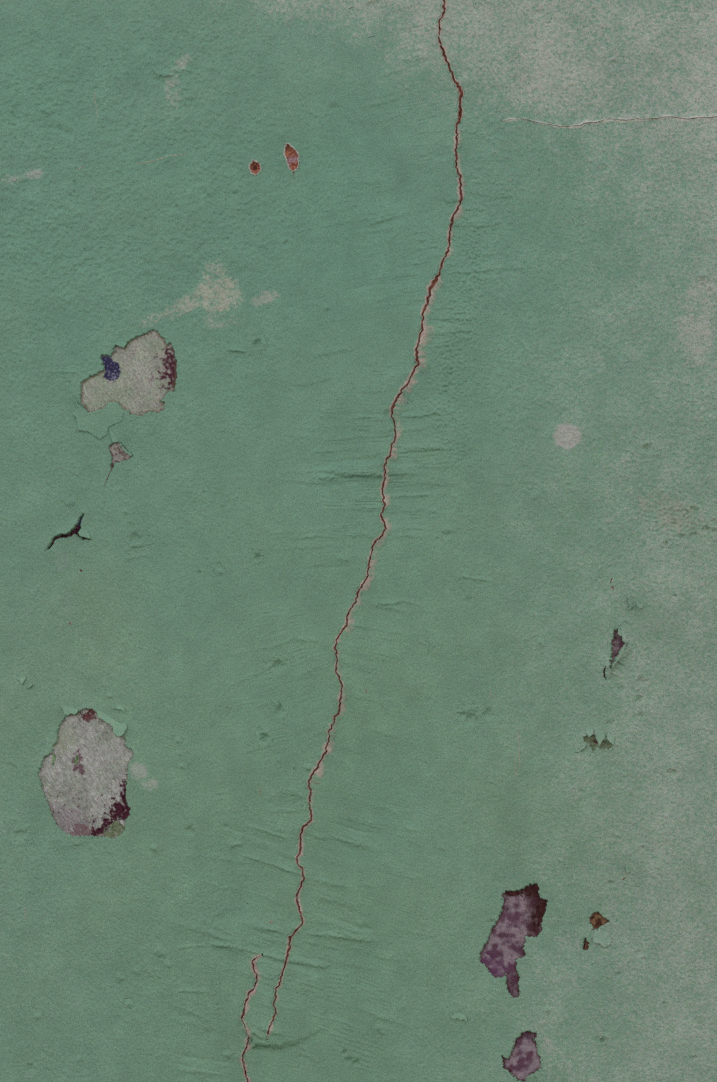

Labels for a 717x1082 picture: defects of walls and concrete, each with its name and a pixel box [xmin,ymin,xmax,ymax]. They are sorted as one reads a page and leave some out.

crack [502,113,717,130]
spalling [248,159,262,176]
hole [283,143,300,176]
peeling [73,330,178,486]
crack [238,0,468,1082]
peeling [603,626,631,679]
peeling [38,704,134,839]
peeling [480,883,548,998]
peeling [583,912,612,950]
peeling [502,1031,542,1082]